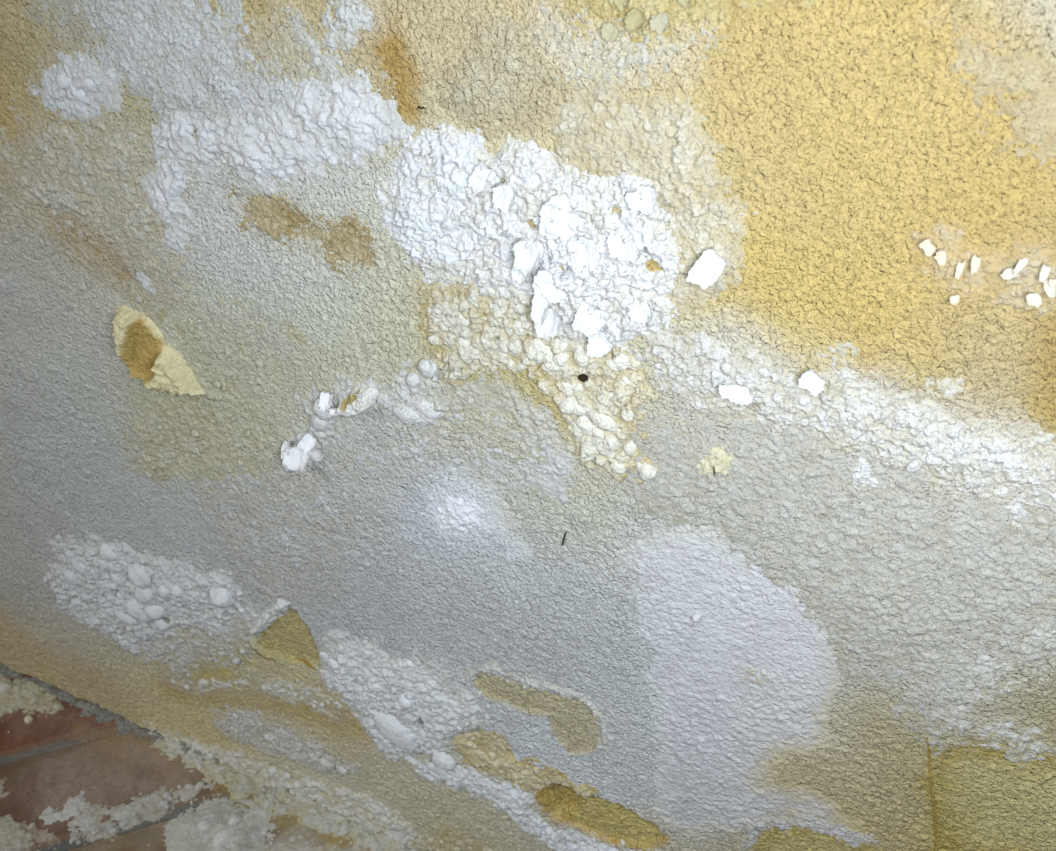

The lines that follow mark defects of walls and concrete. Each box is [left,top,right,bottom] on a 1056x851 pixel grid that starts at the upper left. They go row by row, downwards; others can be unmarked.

water stain [19,0,495,353]
peeling [379,121,728,387]
peeling [905,220,1056,324]
peeling [318,384,378,416]
peeling [281,433,317,472]
flaking render [249,599,321,670]
flaking render [464,660,615,759]
water stain [0,693,420,851]
flaking render [450,728,673,851]